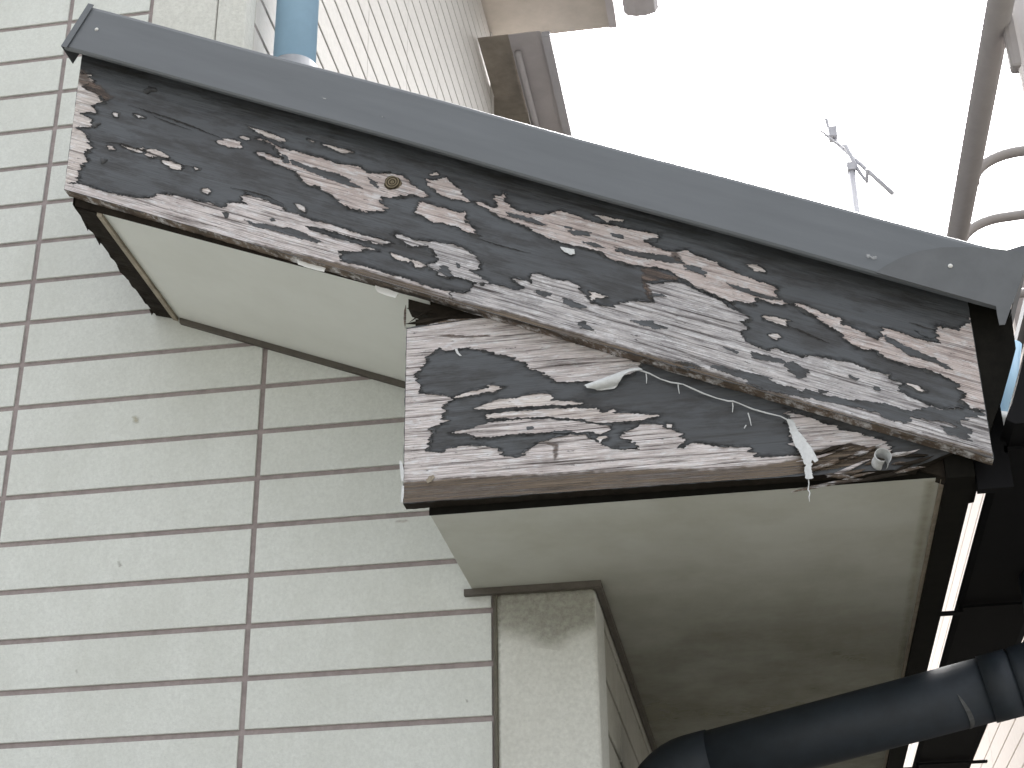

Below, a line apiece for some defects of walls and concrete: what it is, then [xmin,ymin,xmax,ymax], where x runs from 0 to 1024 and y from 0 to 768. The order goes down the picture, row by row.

peeling [64,73,993,502]